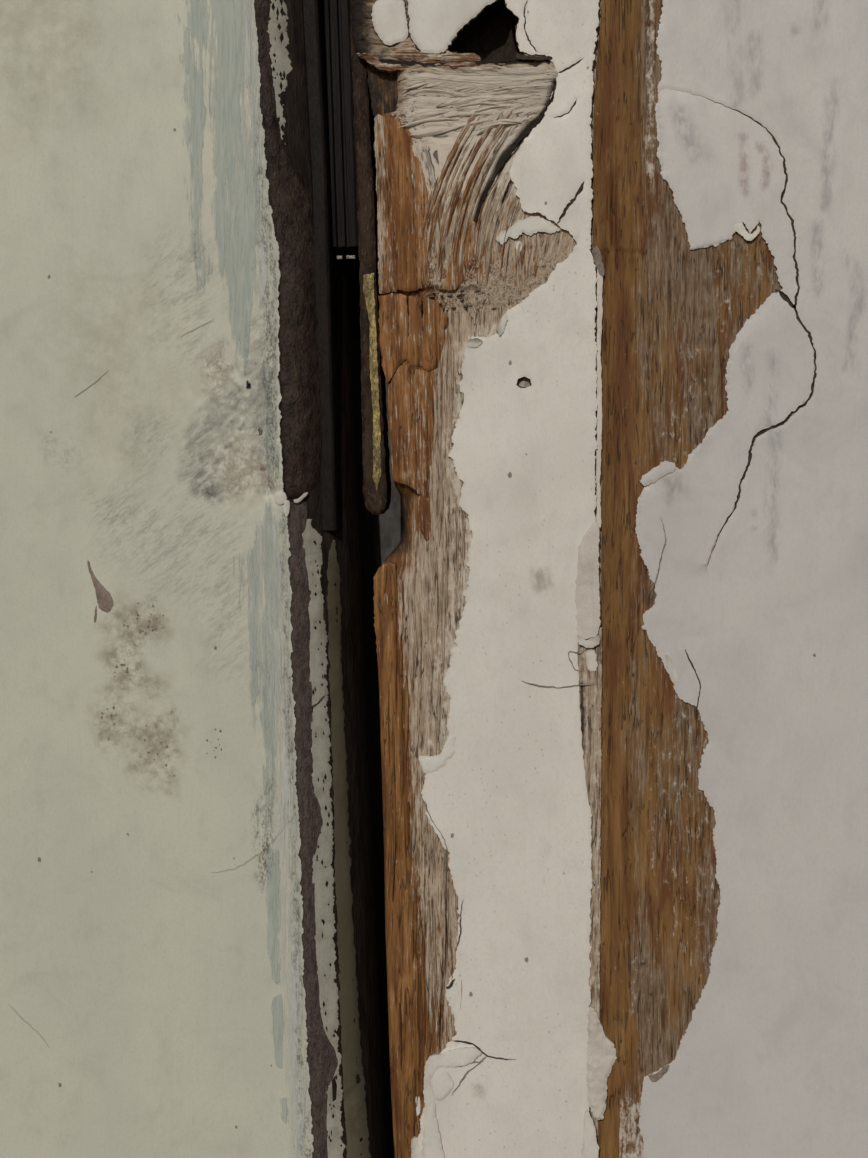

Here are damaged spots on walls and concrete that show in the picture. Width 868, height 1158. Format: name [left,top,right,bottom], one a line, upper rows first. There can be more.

peeling [371,0,409,47]
peeling [496,216,560,252]
crack [689,92,817,563]
crack [648,522,666,595]
peeling [575,0,783,1158]
peeling [373,293,511,1158]
crack [451,1040,516,1096]